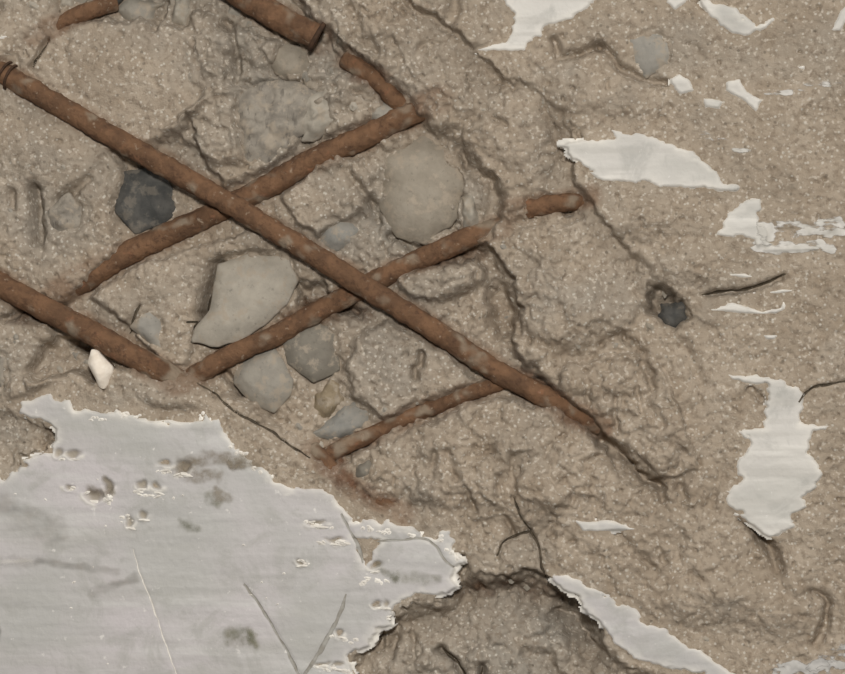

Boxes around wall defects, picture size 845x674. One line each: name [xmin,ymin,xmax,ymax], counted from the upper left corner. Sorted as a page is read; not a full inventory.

peeling [726,79,762,111]
spalling [0,0,740,565]
crack [197,383,310,458]
peeling [0,394,734,674]
peeling [726,374,828,540]